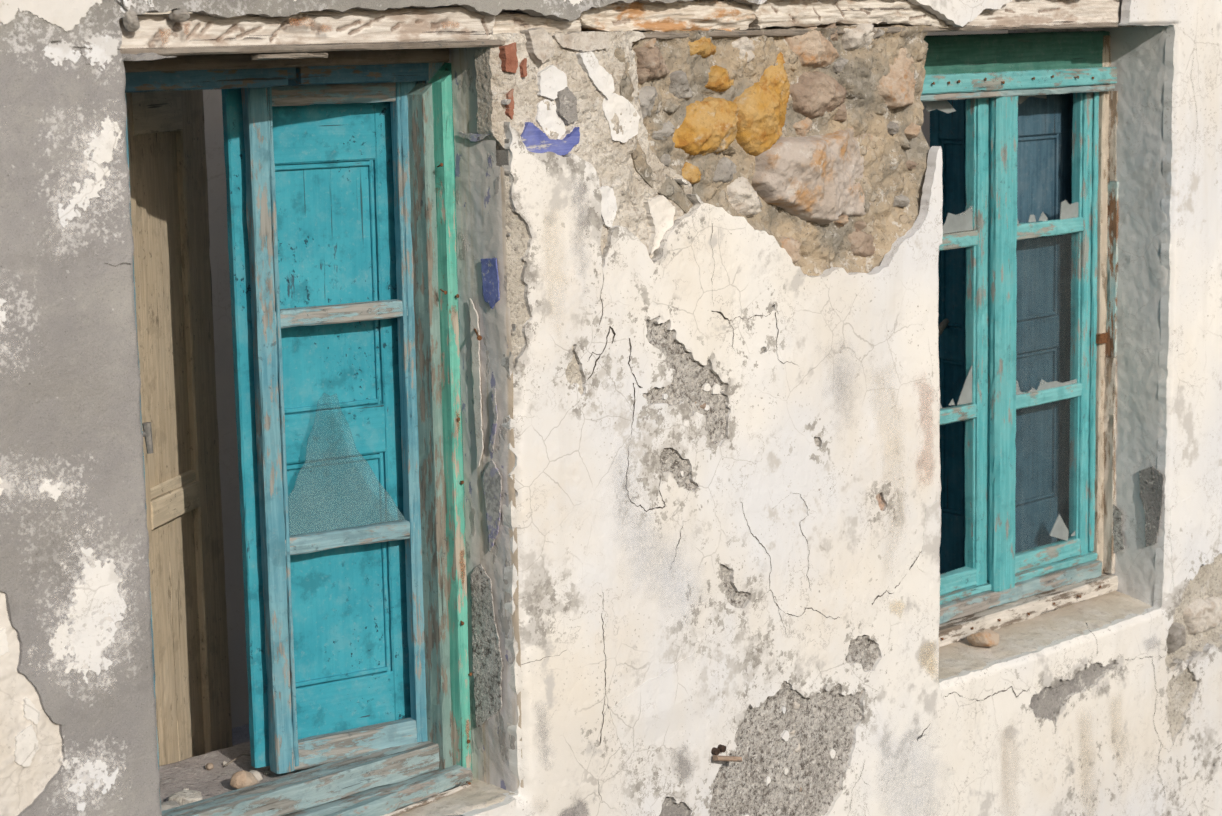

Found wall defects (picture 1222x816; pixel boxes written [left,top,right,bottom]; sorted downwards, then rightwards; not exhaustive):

peeling [0,0,119,71]
crack [51,41,121,68]
peeling [52,107,123,252]
flaking render [459,23,953,276]
crack [711,225,794,364]
crack [587,270,687,570]
spalling [643,317,728,445]
spalling [0,462,137,816]
spalling [708,681,863,816]
crack [741,492,838,635]
crack [872,551,922,605]
spalling [1029,661,1115,721]